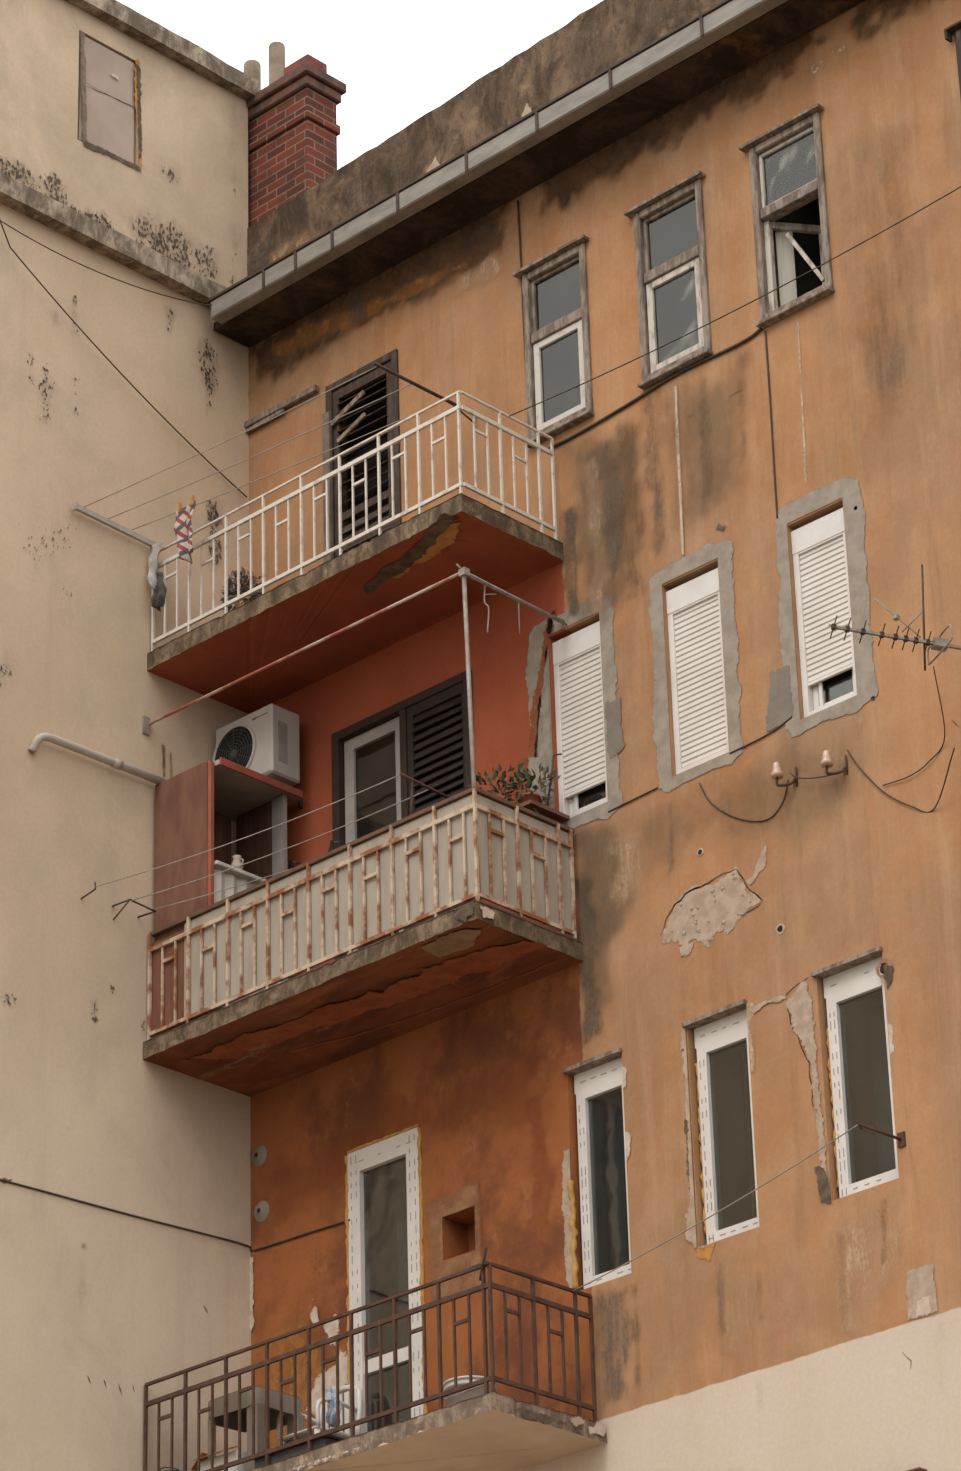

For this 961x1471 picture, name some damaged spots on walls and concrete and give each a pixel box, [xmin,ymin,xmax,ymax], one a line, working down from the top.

damp [544,0,920,208]
damp [0,155,114,230]
damp [133,212,233,284]
damp [235,233,309,273]
flaking render [660,844,767,957]
flaking render [746,977,831,1204]
flaking render [680,1028,717,1261]
peeling [287,1447,360,1471]
spalling [516,1407,608,1437]